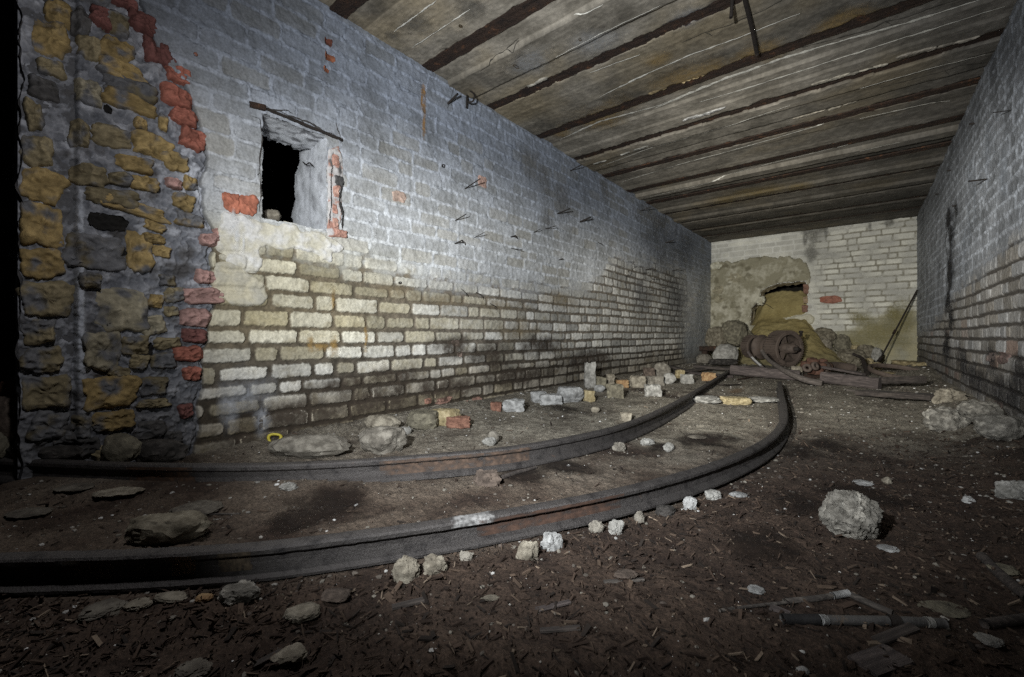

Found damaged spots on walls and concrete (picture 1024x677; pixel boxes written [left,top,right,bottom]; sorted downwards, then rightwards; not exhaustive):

spalling [222,192,259,216]
peeling [332,185,347,238]
spalling [750,281,842,325]